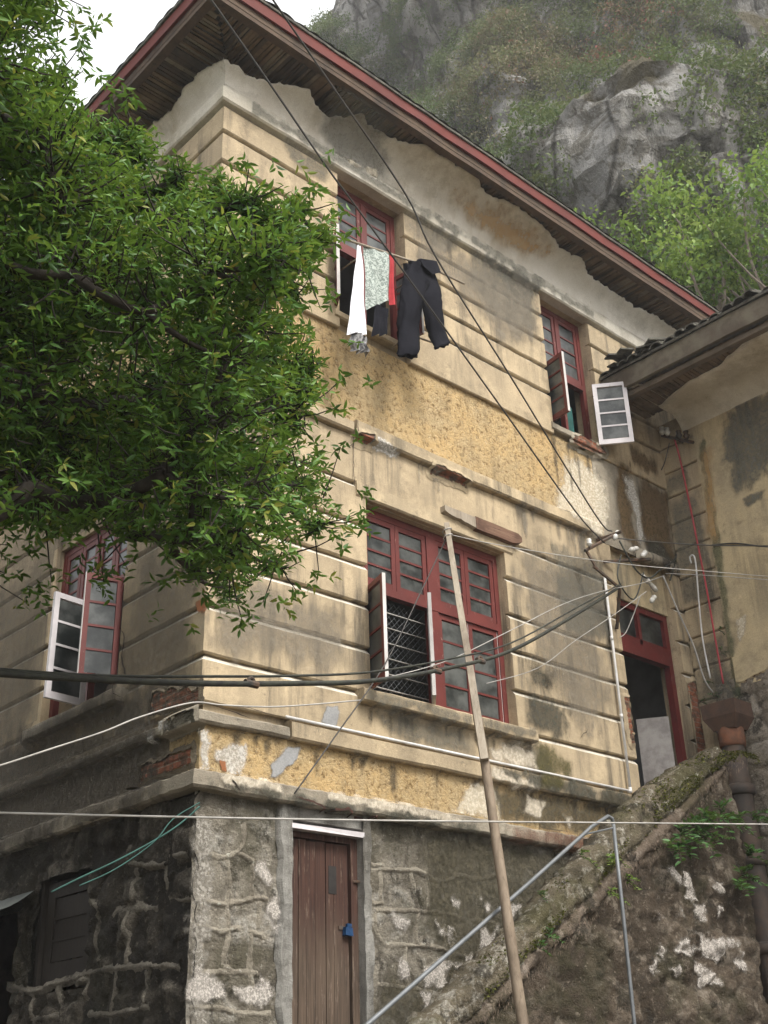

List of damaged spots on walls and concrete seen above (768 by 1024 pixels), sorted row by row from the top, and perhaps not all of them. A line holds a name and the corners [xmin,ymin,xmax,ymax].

damp [723,395,768,506]
damp [369,437,716,817]
flaking render [124,678,247,790]